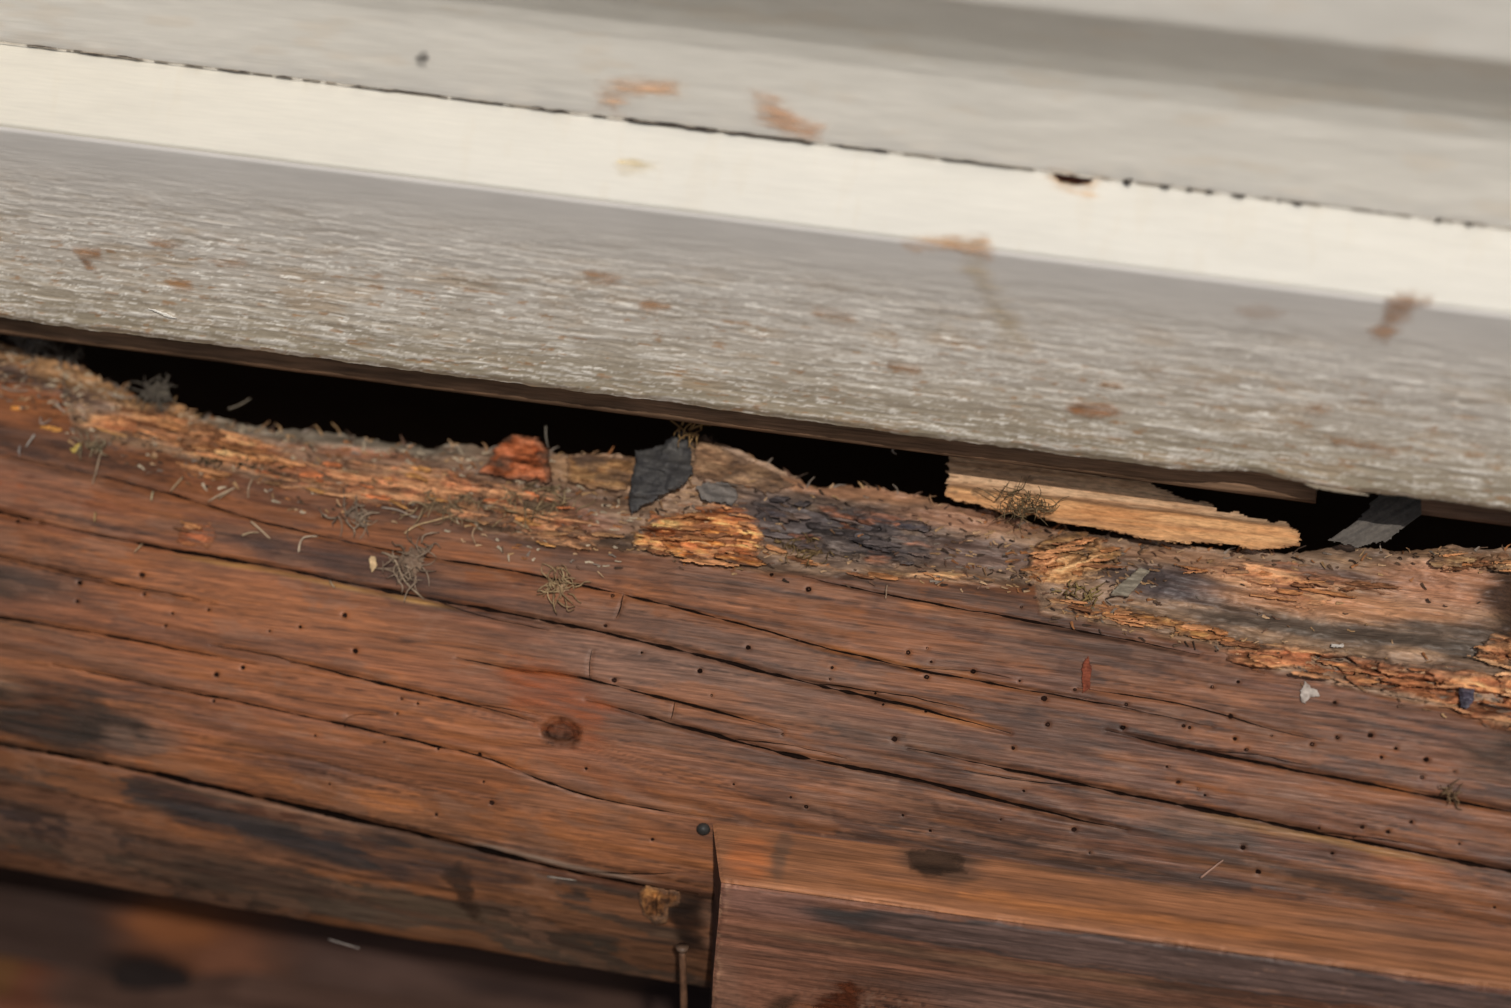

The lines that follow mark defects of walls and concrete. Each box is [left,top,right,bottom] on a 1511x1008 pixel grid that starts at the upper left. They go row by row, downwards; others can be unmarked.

peeling [120,407,343,494]
peeling [478,490,568,547]
peeling [591,505,818,567]
peeling [1020,537,1261,649]
peeling [1257,571,1399,598]
peeling [1305,484,1369,496]
peeling [1439,552,1511,572]
crack [0,454,1511,894]
peeling [1273,661,1349,704]
peeling [1371,638,1511,714]
leakage [0,683,144,748]